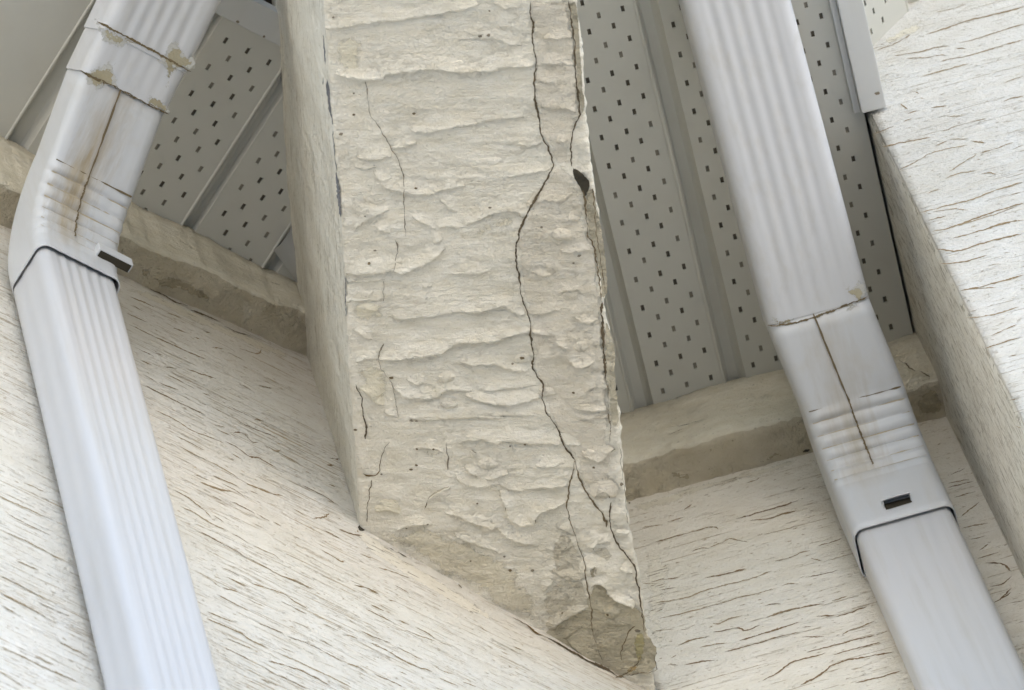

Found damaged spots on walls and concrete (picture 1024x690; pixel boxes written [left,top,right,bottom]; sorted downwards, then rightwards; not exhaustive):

crack [365,82,406,301]
spalling [573,169,608,298]
crack [378,344,399,417]
crack [514,2,820,678]
crack [356,386,389,521]
spalling [544,534,657,676]